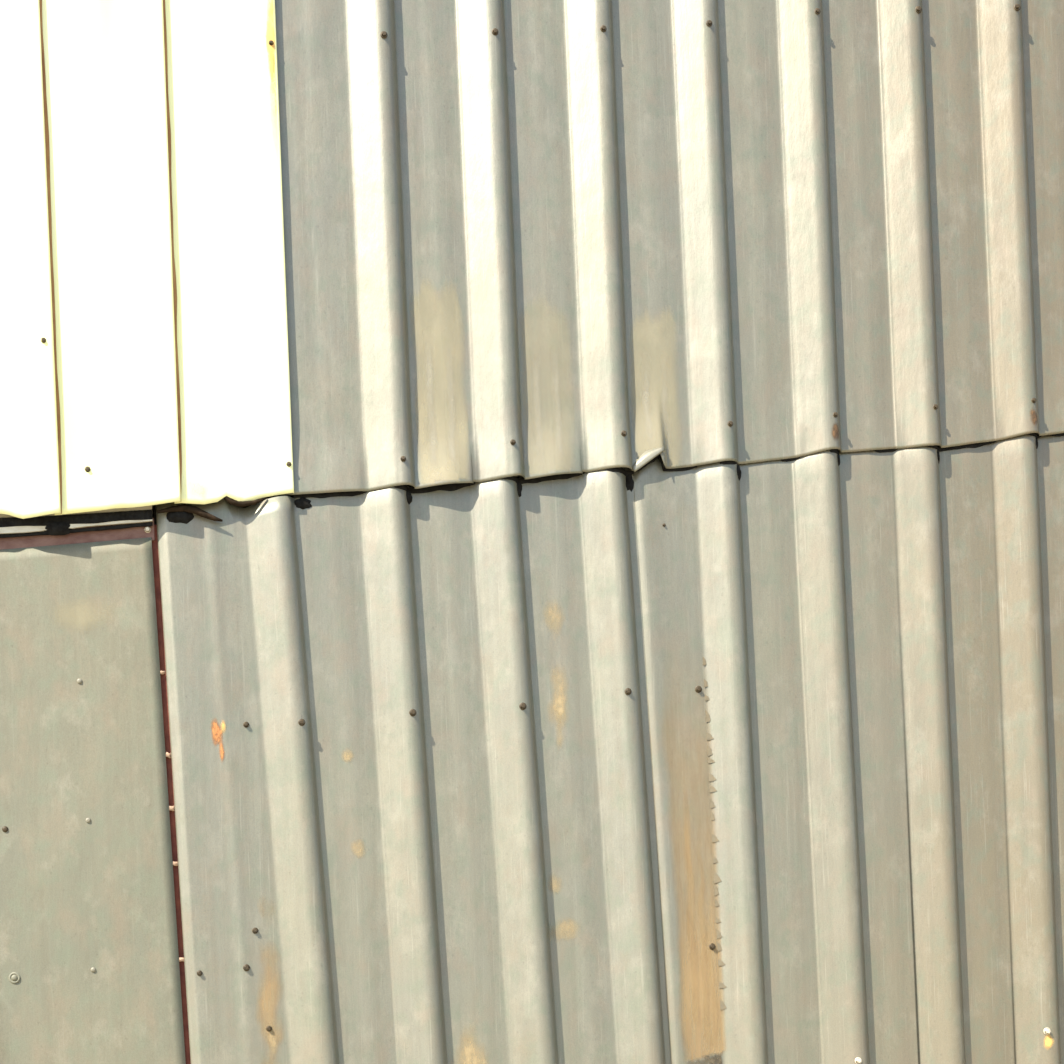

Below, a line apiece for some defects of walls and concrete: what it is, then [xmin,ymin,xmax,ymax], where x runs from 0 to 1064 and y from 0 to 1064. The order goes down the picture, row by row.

rust [212,722,225,759]
rust [681,894,724,1060]